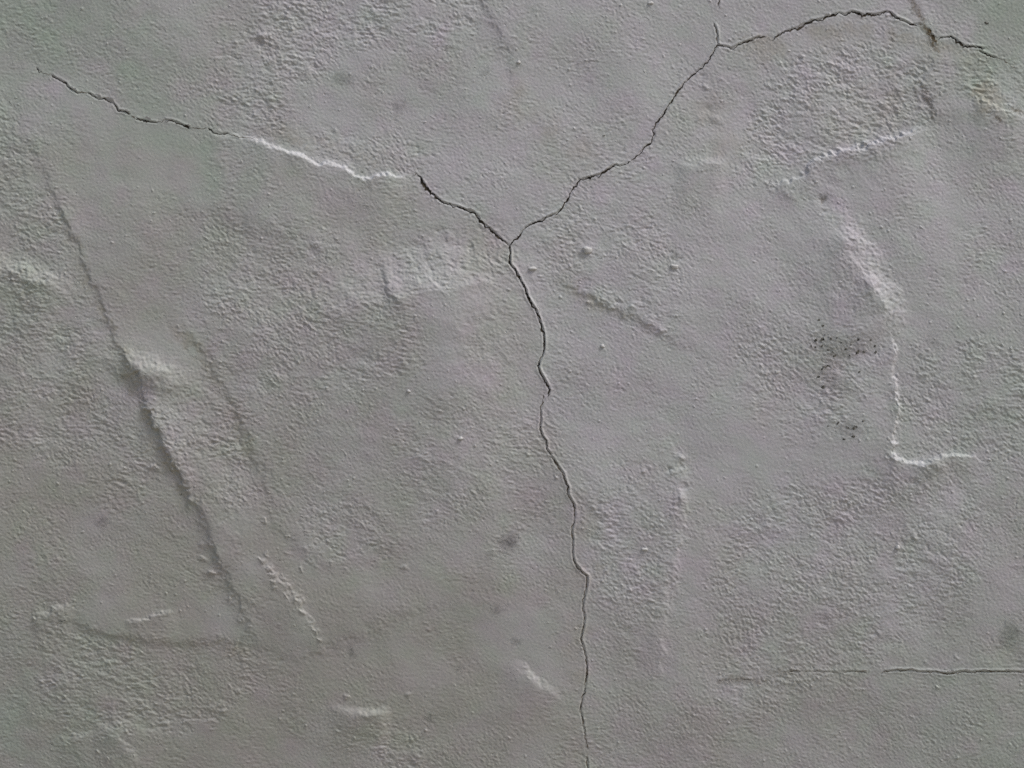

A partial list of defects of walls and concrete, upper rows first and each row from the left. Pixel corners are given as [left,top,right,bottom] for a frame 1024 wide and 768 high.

crack [36,67,249,138]
crack [415,0,1021,768]